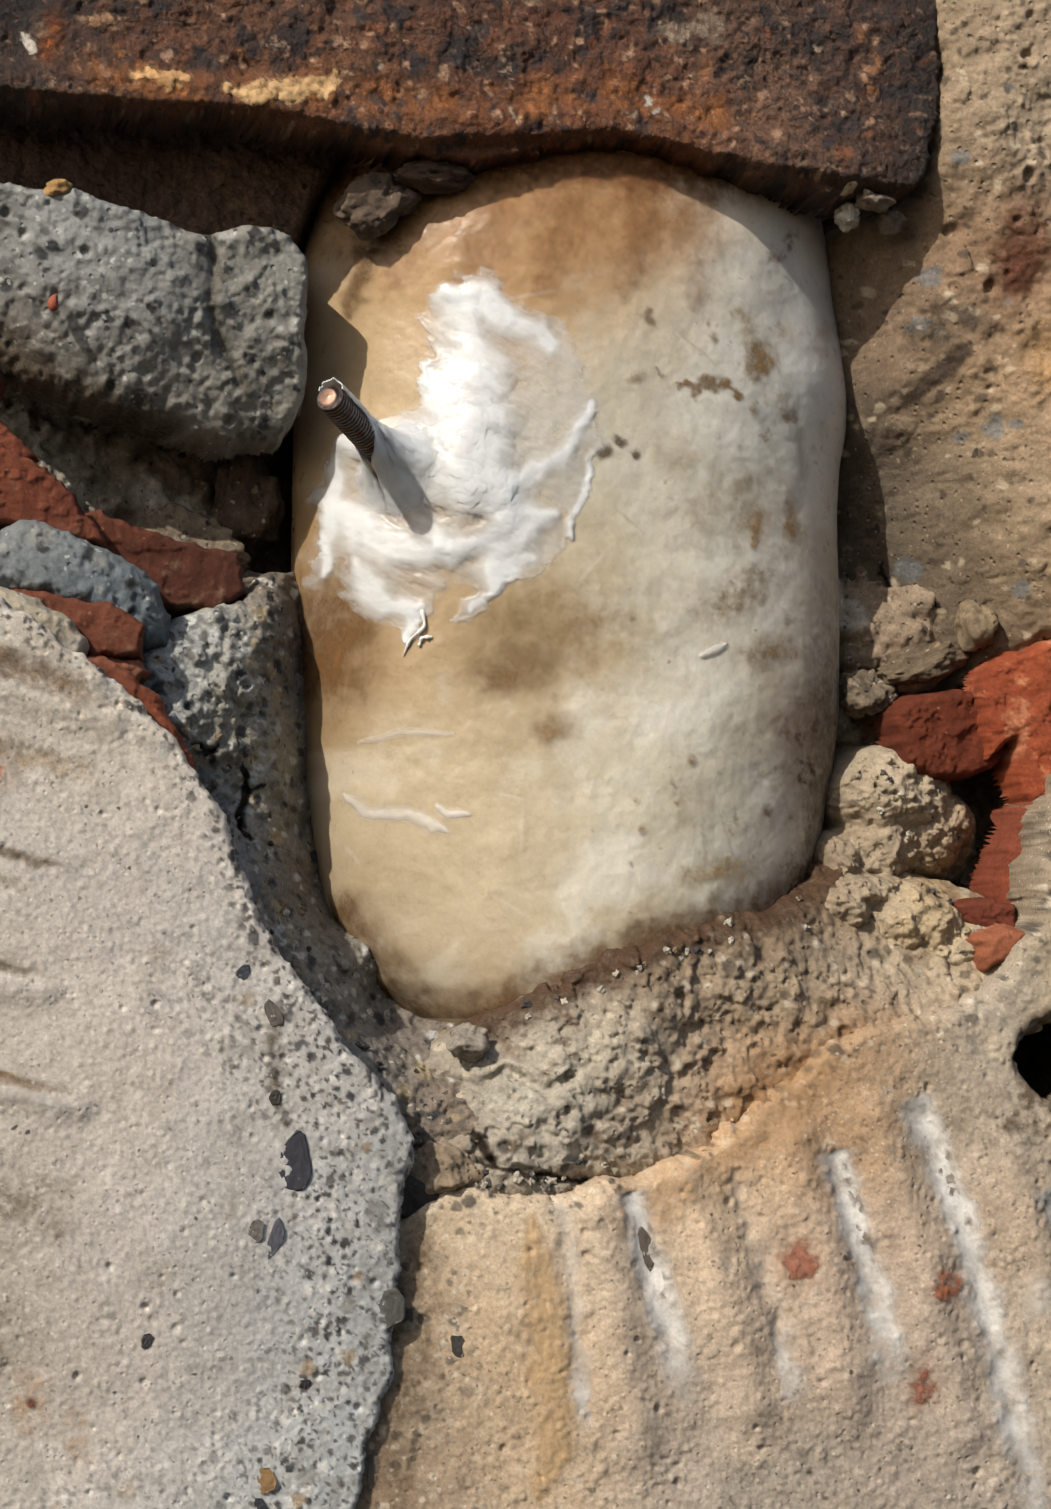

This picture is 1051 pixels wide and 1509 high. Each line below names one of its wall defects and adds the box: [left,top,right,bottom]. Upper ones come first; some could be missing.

corrosion [524,77,574,117]
corrosion [475,151,730,211]
water stain [343,235,387,318]
water stain [301,593,372,700]
crack [191,743,266,841]